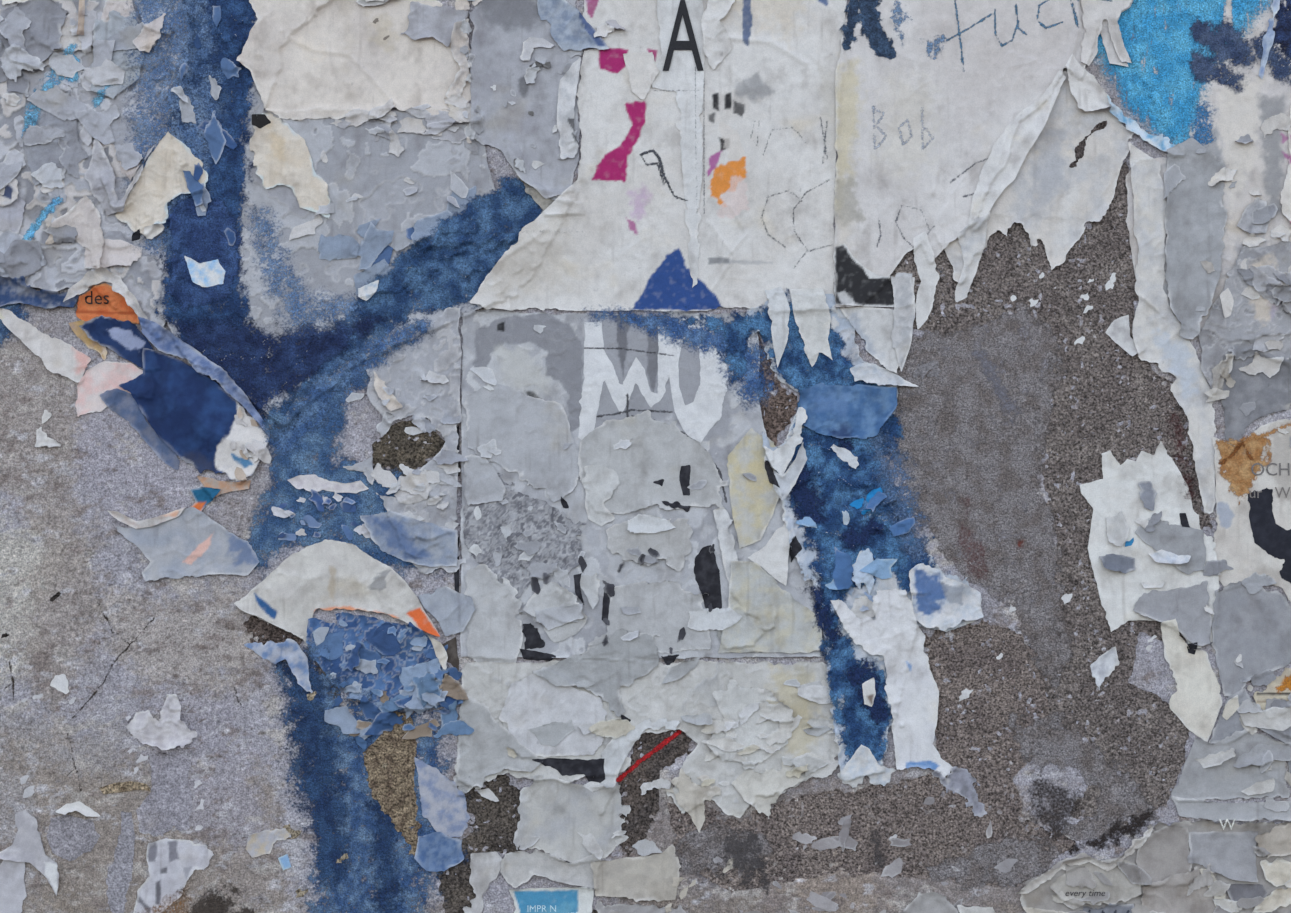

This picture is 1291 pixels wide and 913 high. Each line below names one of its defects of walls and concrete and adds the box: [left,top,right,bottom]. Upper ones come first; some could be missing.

peeling [0,0,241,278]
peeling [330,0,484,157]
peeling [490,50,583,116]
peeling [594,20,626,38]
peeling [1236,113,1291,144]
peeling [289,170,487,297]
peeling [230,406,271,481]
peeling [271,489,370,541]
peeling [346,392,364,403]
spalling [370,387,570,587]
spalling [528,162,1291,913]
spalling [243,616,540,913]